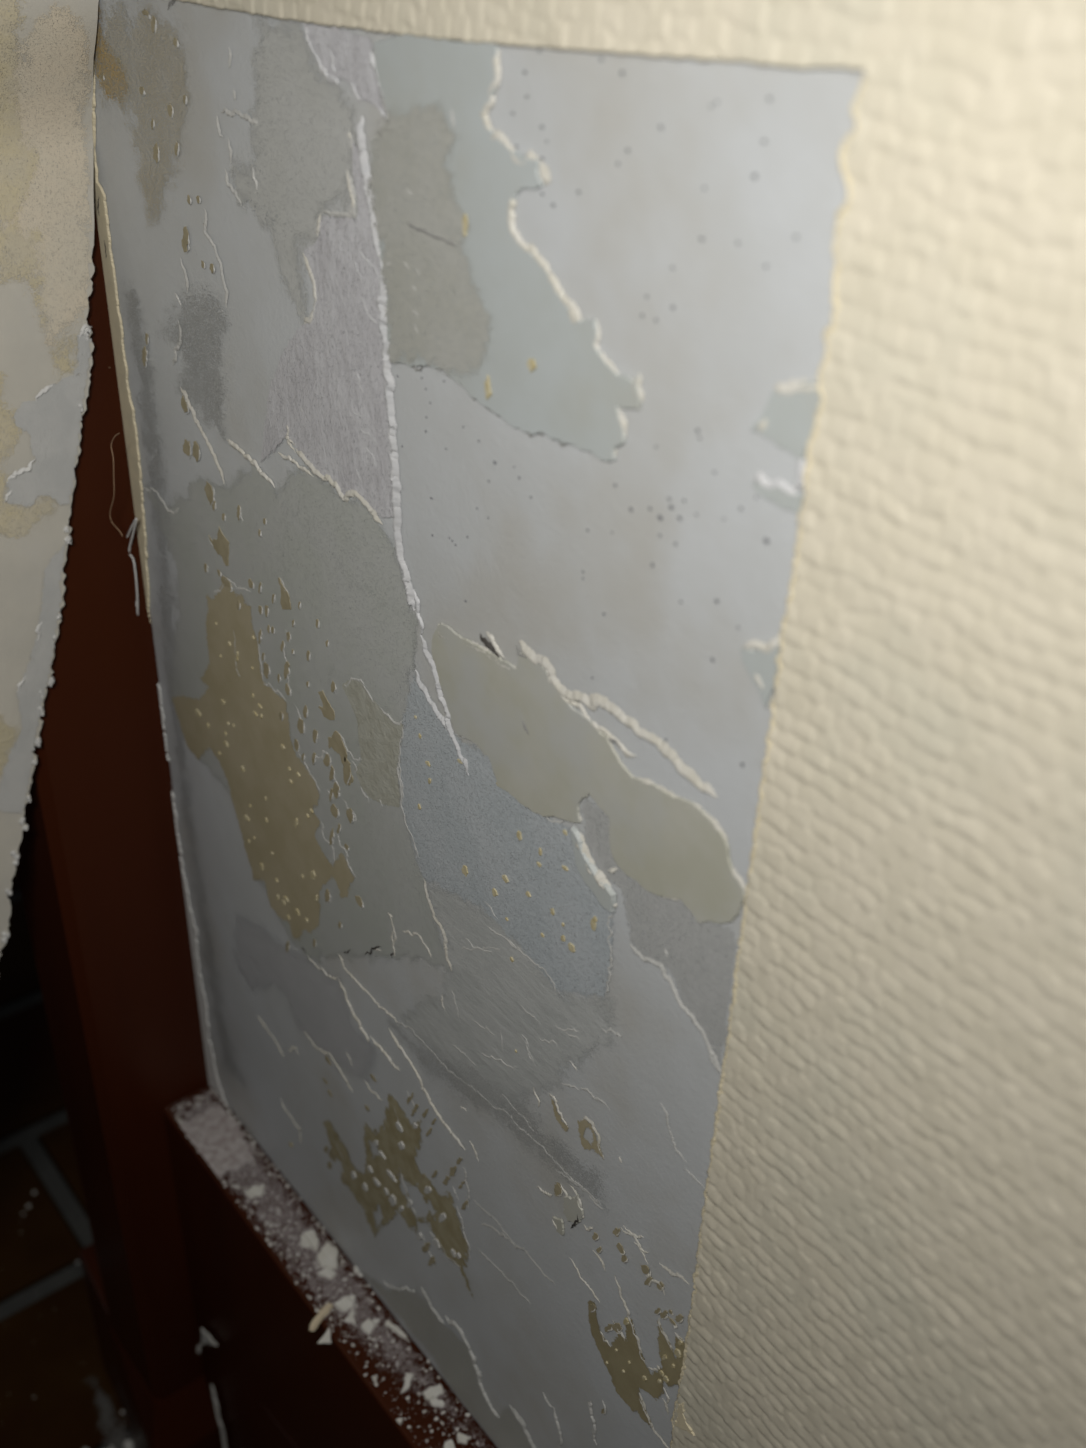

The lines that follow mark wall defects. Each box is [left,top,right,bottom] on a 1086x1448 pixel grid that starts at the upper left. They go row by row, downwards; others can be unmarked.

peeling [0,0,863,1448]